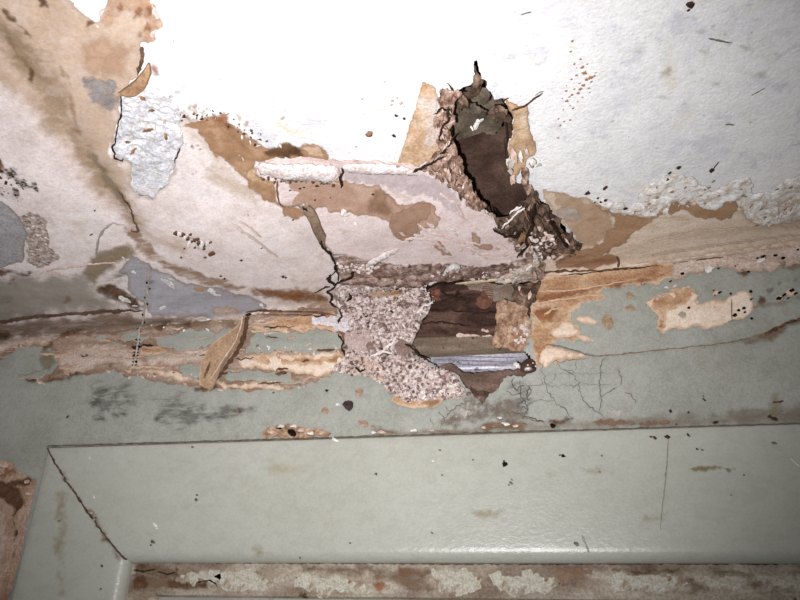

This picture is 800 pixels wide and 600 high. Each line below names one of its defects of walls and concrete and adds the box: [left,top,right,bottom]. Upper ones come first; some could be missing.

rust [558,59,596,126]
water stain [0,0,329,341]
peeling [0,0,800,409]
crack [245,238,355,316]
crack [0,309,143,324]
mould [157,404,242,424]
crack [46,317,800,560]
peeling [0,460,36,600]
peeling [180,569,273,593]
peeling [293,570,373,598]
peeling [431,567,560,597]
peeling [608,570,688,594]